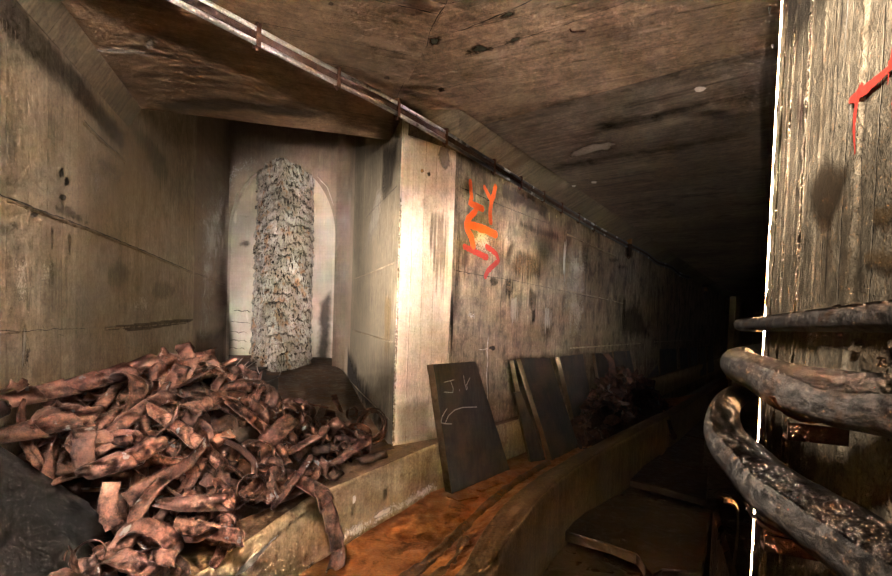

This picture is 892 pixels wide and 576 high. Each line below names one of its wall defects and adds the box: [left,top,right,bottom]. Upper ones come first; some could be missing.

crack [248,0,464,57]
crack [455,0,531,32]
leakage [811,162,847,223]